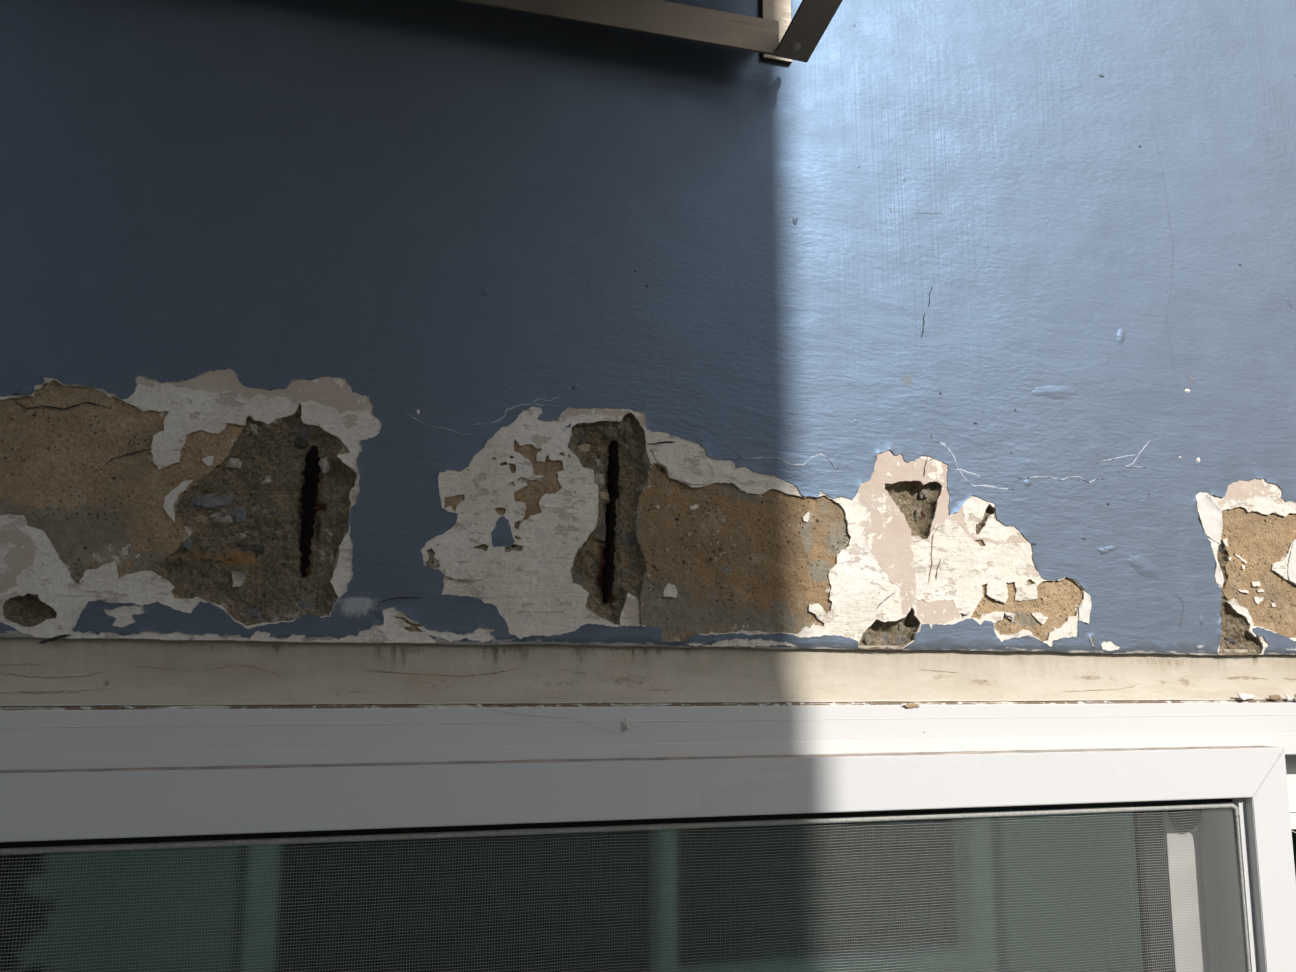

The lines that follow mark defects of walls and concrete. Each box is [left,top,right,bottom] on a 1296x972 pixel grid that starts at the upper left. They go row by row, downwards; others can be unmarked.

peeling [0,368,1121,651]